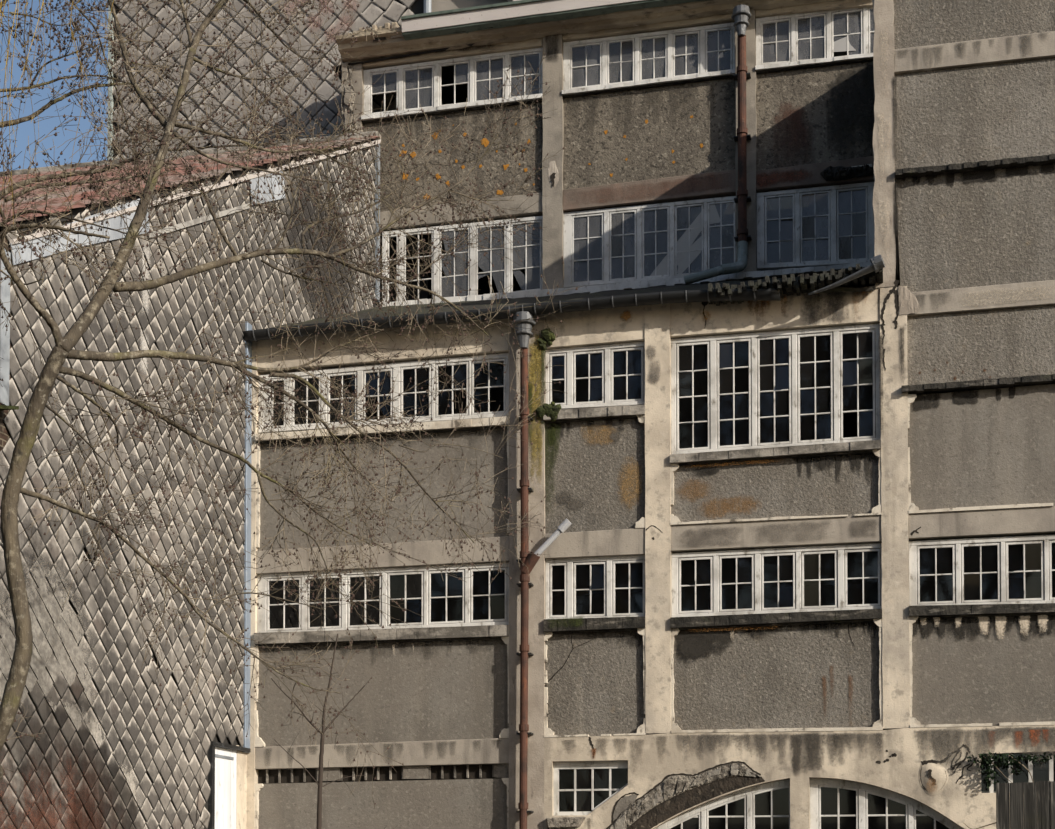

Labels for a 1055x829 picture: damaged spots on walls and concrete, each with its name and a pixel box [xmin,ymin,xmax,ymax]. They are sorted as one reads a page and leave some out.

damp [756,58,897,157]
crack [880,280,899,371]
damp [529,336,639,510]
damp [678,450,877,483]
damp [912,612,1055,639]
damp [658,733,883,771]